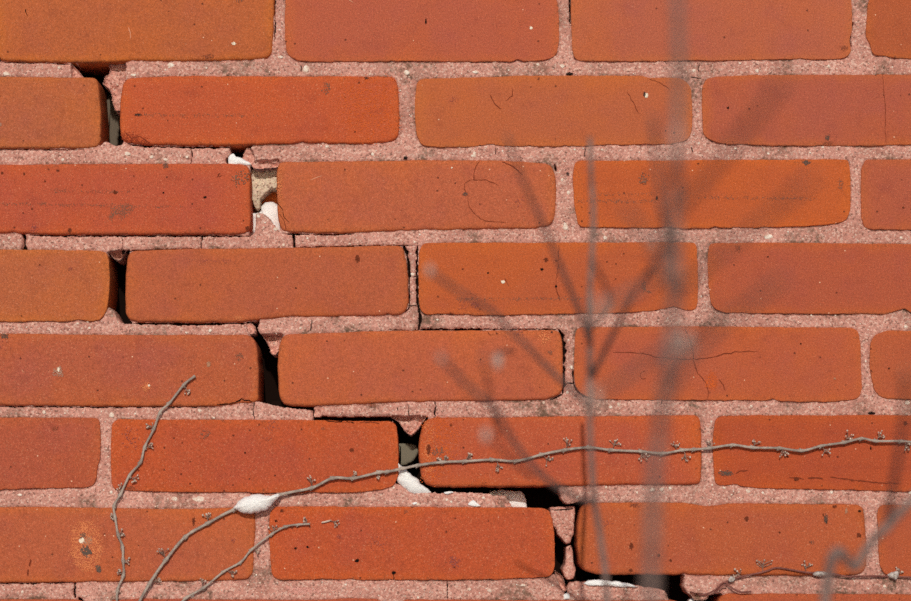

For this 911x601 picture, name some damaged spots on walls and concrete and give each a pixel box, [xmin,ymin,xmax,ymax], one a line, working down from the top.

crack [57,64,112,97]
crack [119,132,244,164]
crack [464,148,517,223]
crack [277,202,355,248]
crack [613,349,755,395]
crack [0,235,711,601]